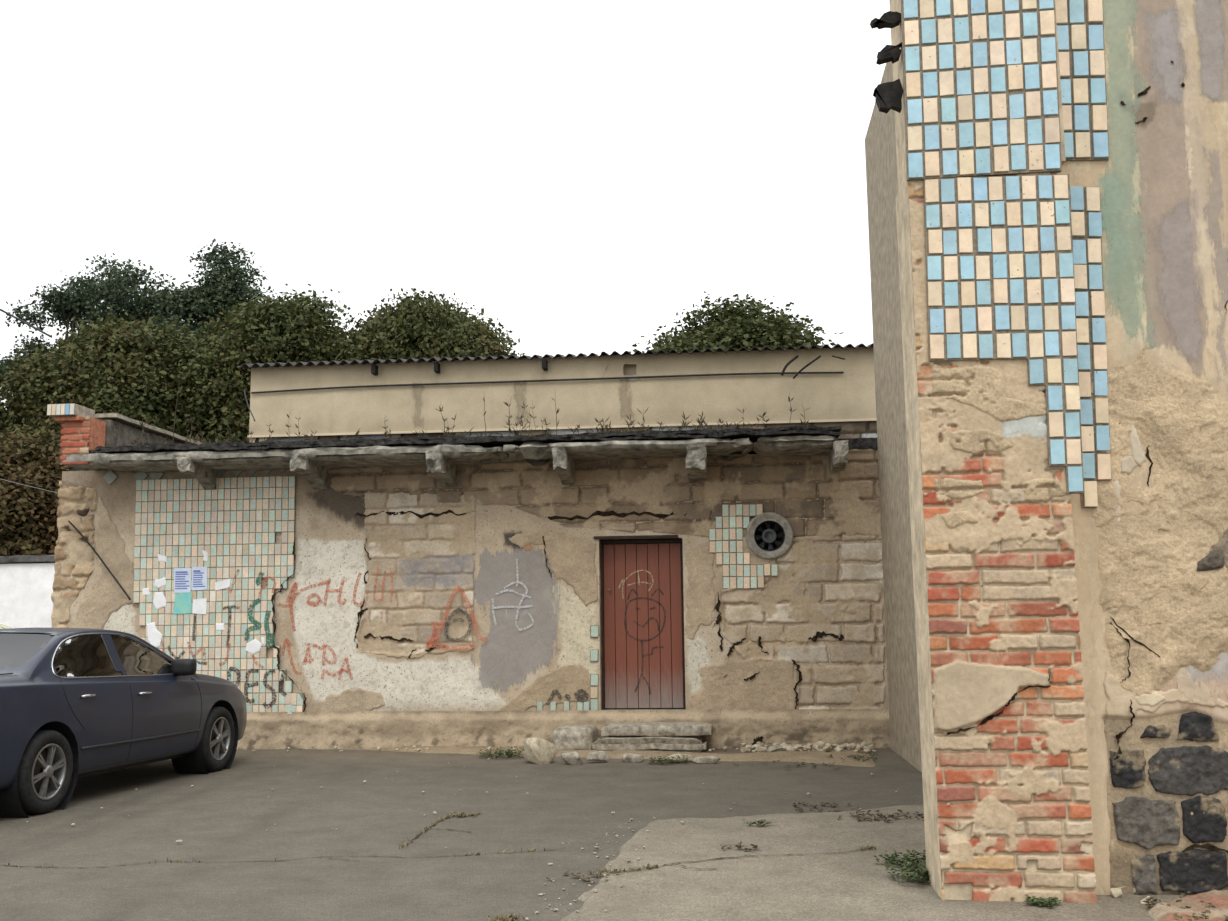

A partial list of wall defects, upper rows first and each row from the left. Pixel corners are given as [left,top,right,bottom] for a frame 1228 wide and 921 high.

flaking render [51,481,97,628]
spalling [327,449,885,709]
flaking render [932,477,989,529]
flaking render [930,364,1046,456]
flaking render [1021,477,1066,506]
flaking render [1091,0,1228,895]